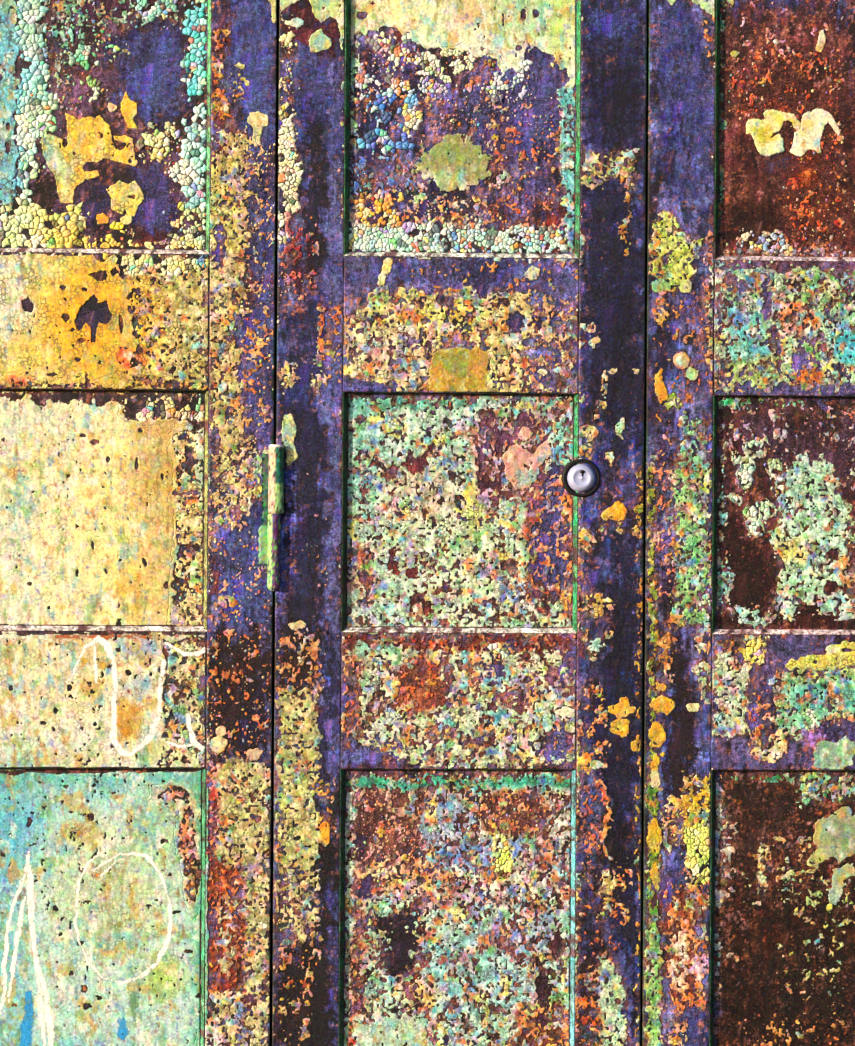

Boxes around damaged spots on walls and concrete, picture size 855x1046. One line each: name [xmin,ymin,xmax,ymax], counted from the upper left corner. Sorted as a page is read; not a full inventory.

rust [723,50,855,256]
peeling [0,0,641,1046]
rust [392,445,440,479]
rust [344,535,584,719]
rust [475,468,509,501]
peeling [579,0,855,1046]
rust [205,757,246,994]
rust [656,775,855,1046]